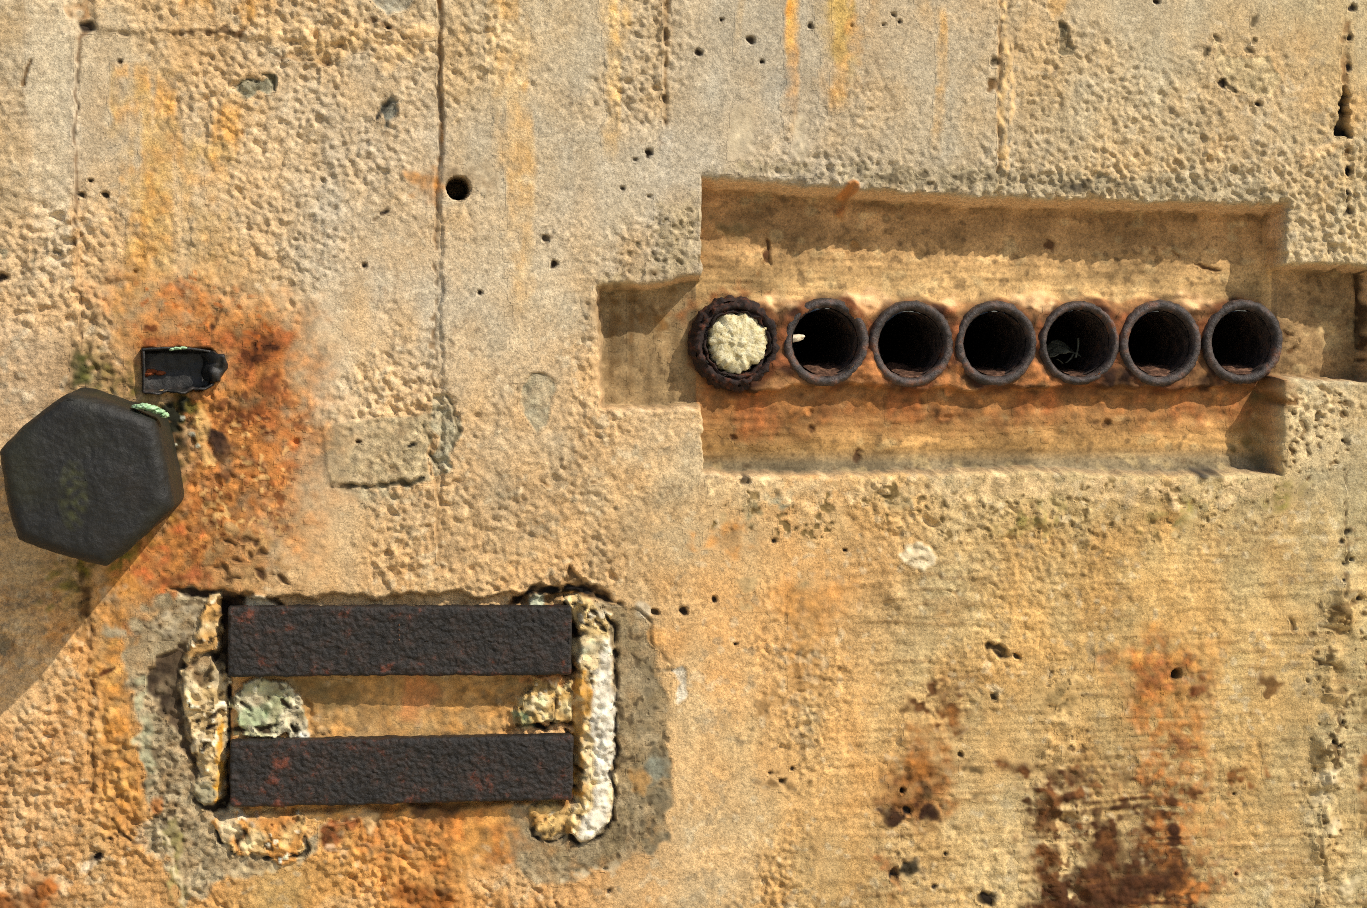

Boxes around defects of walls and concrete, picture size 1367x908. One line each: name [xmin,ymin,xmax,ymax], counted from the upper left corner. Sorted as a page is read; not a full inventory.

rust [779,0,882,143]
rust [669,276,785,379]
rust [60,60,365,840]
rust [669,351,1304,452]
damp [1185,379,1293,481]
spalling [163,584,287,606]
spalling [505,563,689,706]
spalling [143,640,200,783]
rust [279,675,529,738]
rust [862,669,978,908]
rust [989,611,1251,908]
rust [0,867,64,908]